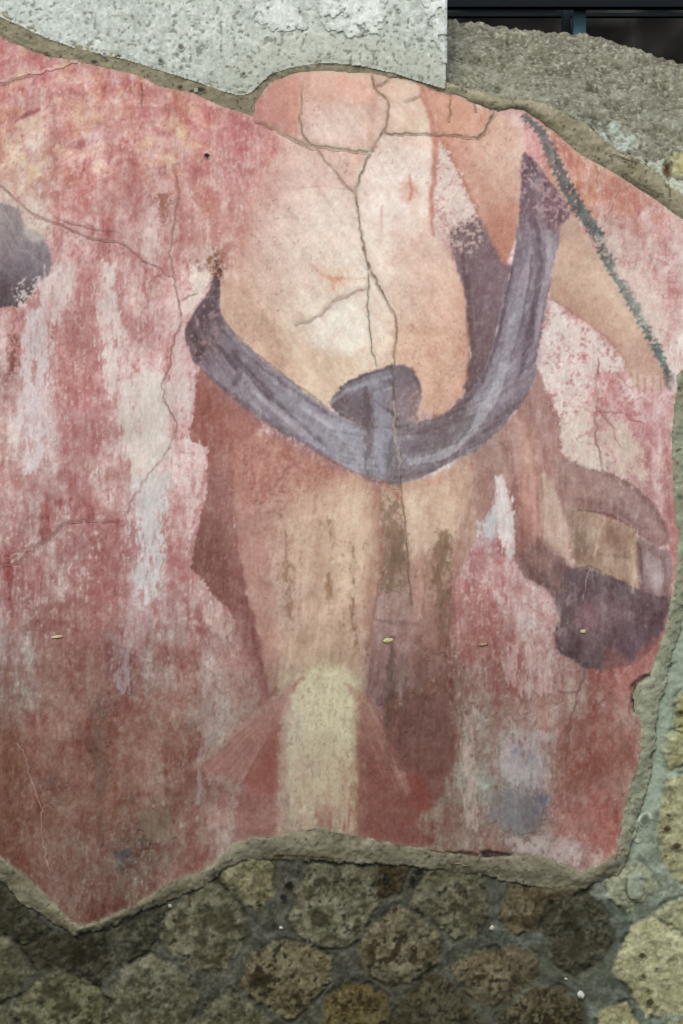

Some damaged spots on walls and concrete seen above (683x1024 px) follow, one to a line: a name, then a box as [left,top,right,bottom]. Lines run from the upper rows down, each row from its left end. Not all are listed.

crack [0,59,78,85]
crack [0,164,198,567]
crack [254,74,497,606]